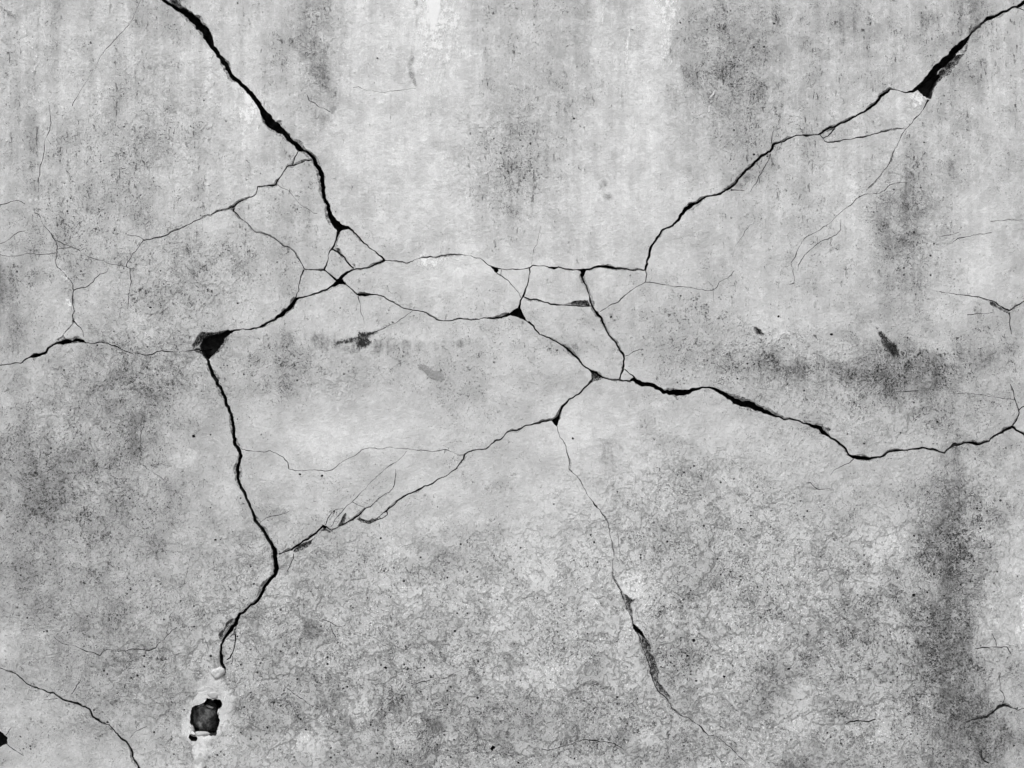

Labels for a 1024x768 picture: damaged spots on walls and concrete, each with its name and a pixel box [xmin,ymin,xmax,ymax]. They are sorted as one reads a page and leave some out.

crack [19,212,120,273]
crack [0,272,173,366]
crack [126,0,1024,673]
crack [0,667,147,768]
crack [54,627,177,656]
crack [612,558,683,717]
crack [687,717,744,761]
crack [964,634,1024,723]